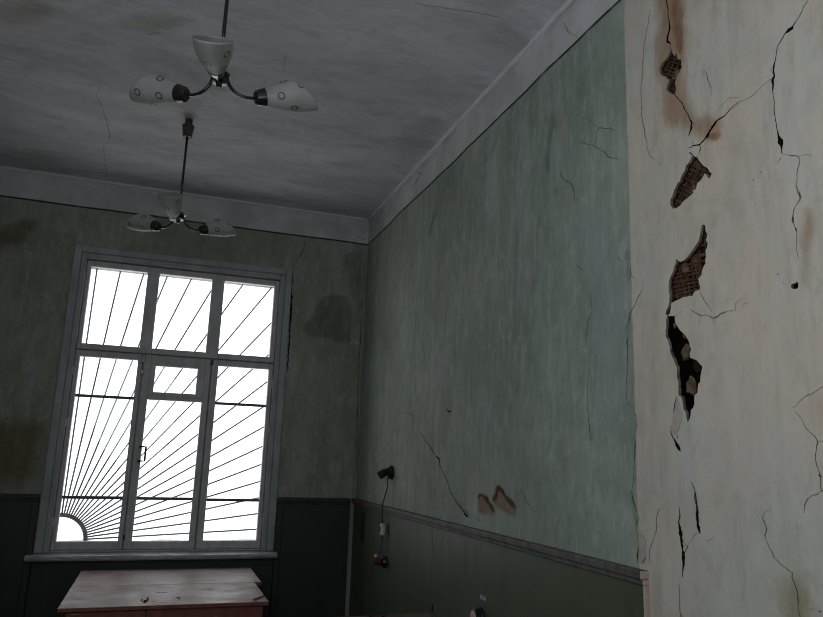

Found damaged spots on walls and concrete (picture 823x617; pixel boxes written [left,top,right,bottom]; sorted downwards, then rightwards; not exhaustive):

crack [642,0,671,76]
spalling [659,47,682,95]
crack [771,2,807,171]
crack [675,95,740,157]
spalling [670,155,712,209]
spalling [665,225,708,434]
crack [670,396,681,452]
crack [421,433,478,519]
peeling [478,486,515,515]
crack [678,482,713,609]